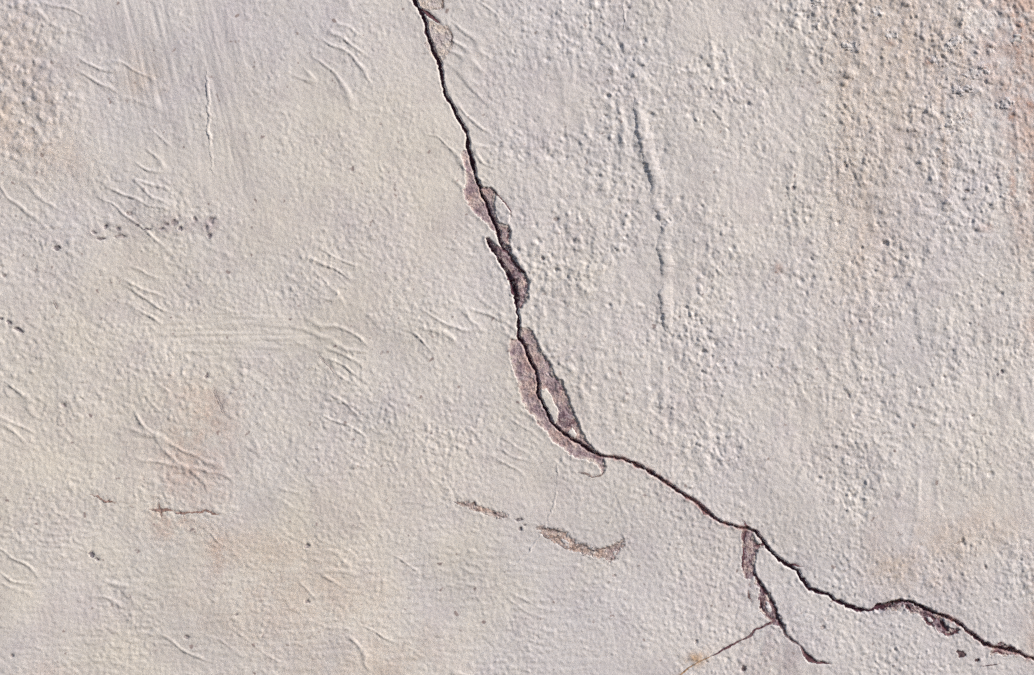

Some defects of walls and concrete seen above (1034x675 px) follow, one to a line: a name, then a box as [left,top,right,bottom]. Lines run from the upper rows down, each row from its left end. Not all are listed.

peeling [418,0,453,62]
flaking render [461,150,529,308]
flaking render [509,328,606,478]
crack [413,0,1034,675]
peeling [456,501,626,563]